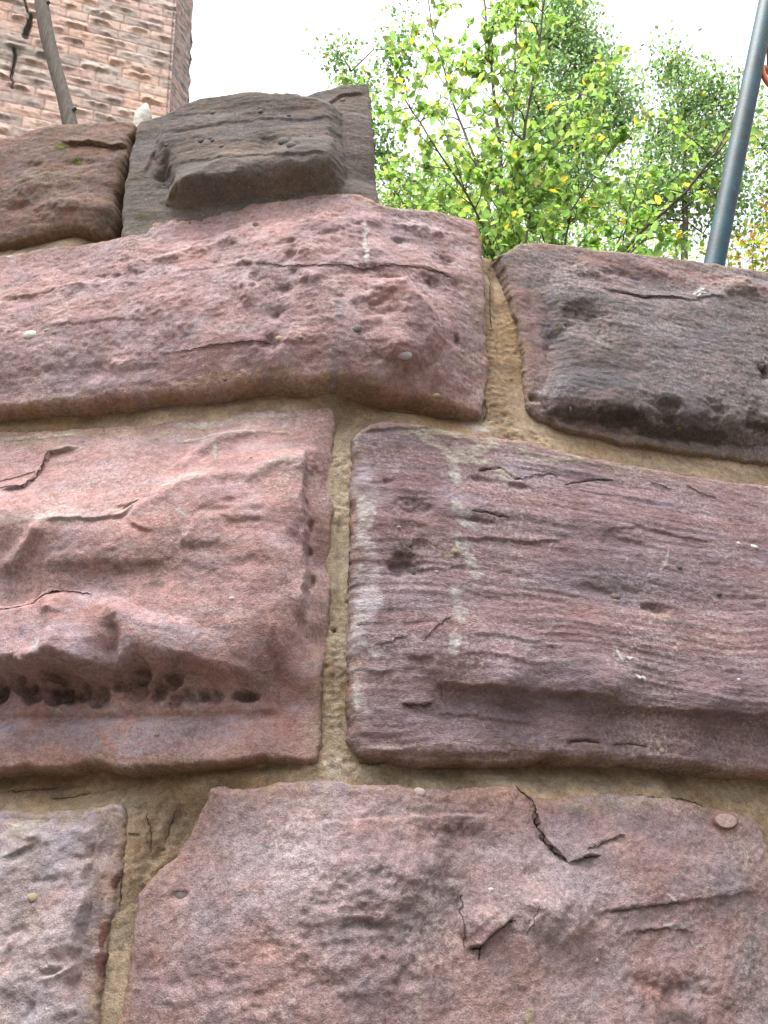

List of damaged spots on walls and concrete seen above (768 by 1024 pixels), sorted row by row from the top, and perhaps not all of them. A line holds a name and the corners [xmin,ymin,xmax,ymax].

crack [0,450,48,488]
crack [1,590,90,609]
crack [518,788,625,862]
crack [459,894,539,959]